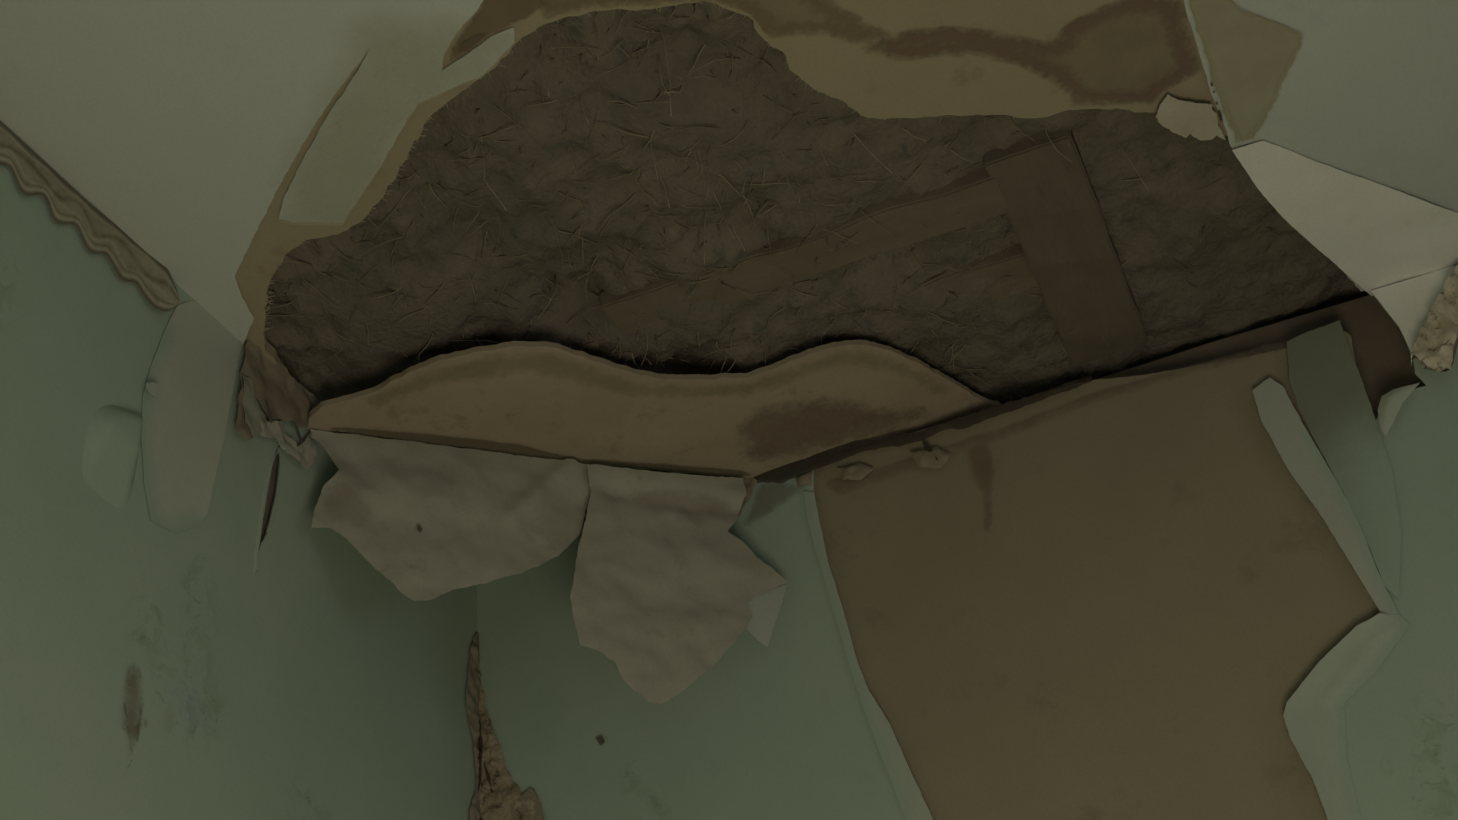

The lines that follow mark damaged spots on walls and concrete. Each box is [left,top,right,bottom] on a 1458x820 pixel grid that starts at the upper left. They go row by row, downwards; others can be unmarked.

peeling [235,0,1458,365]
water stain [720,0,1302,141]
peeling [814,348,1380,820]